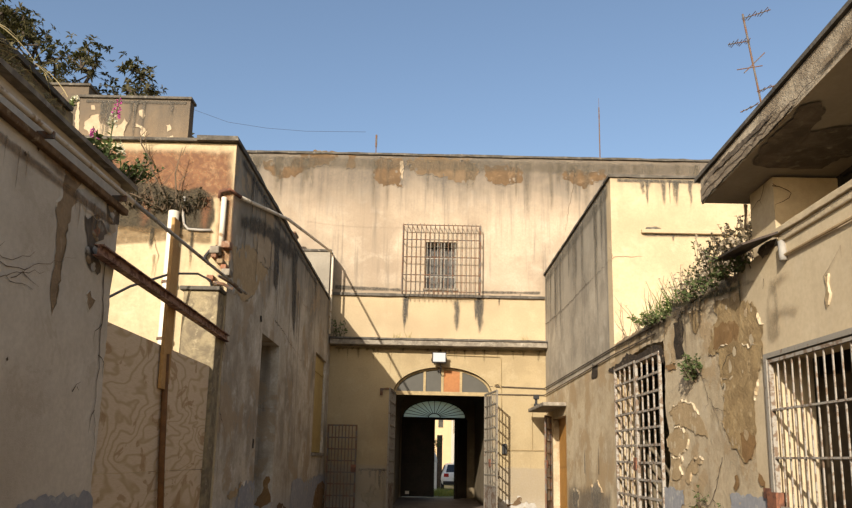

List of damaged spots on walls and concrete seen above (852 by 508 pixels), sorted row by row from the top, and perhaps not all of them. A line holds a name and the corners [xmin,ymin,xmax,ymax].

peeling [75,98,147,137]
spalling [753,102,852,170]
damp [618,179,694,201]
crack [0,242,69,289]
peeling [50,171,120,313]
peeling [206,218,274,302]
spalling [608,305,701,373]
peeling [708,293,763,463]
peeling [664,399,708,508]
peeling [16,490,93,508]
peeling [254,476,286,508]
peeling [730,472,767,508]